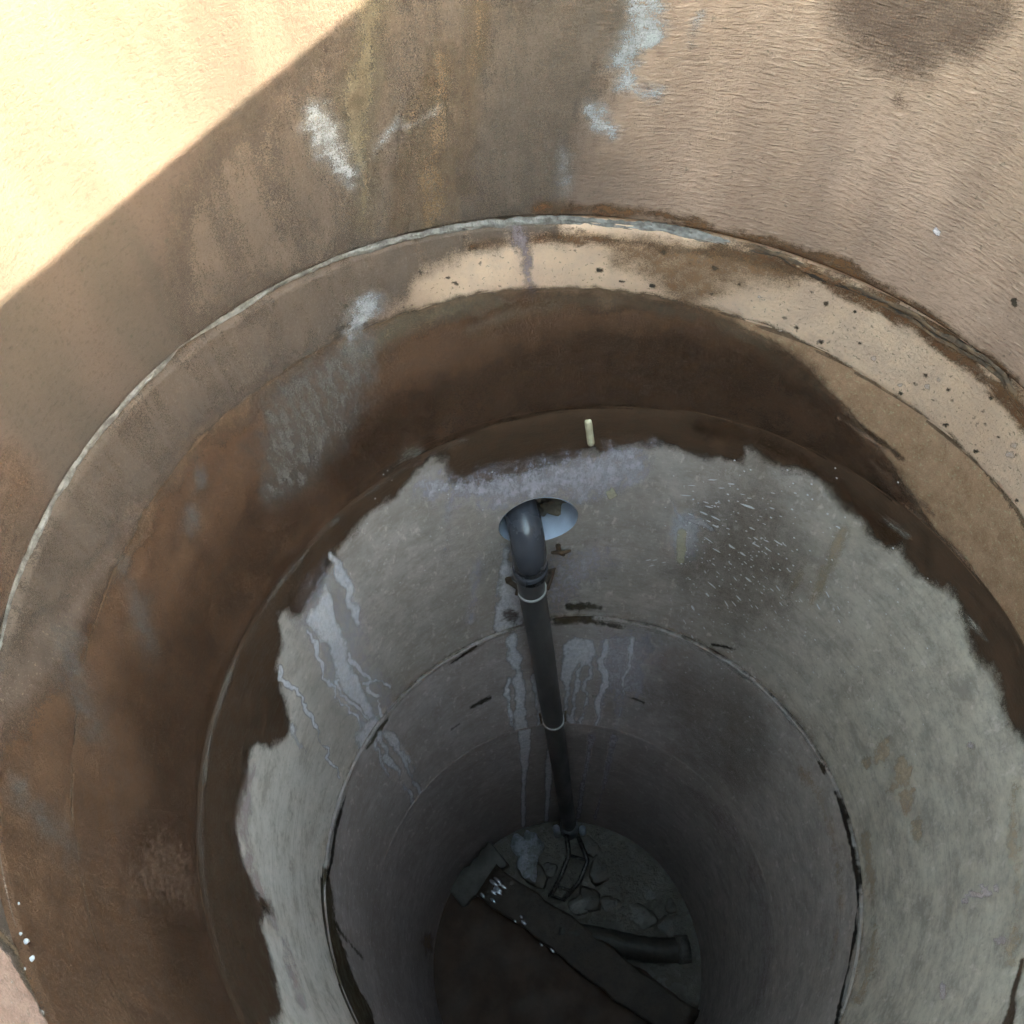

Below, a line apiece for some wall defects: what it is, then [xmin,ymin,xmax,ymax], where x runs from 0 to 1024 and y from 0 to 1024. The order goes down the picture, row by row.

water stain [170,0,666,337]
water stain [834,0,1010,75]
water stain [0,224,1024,1024]